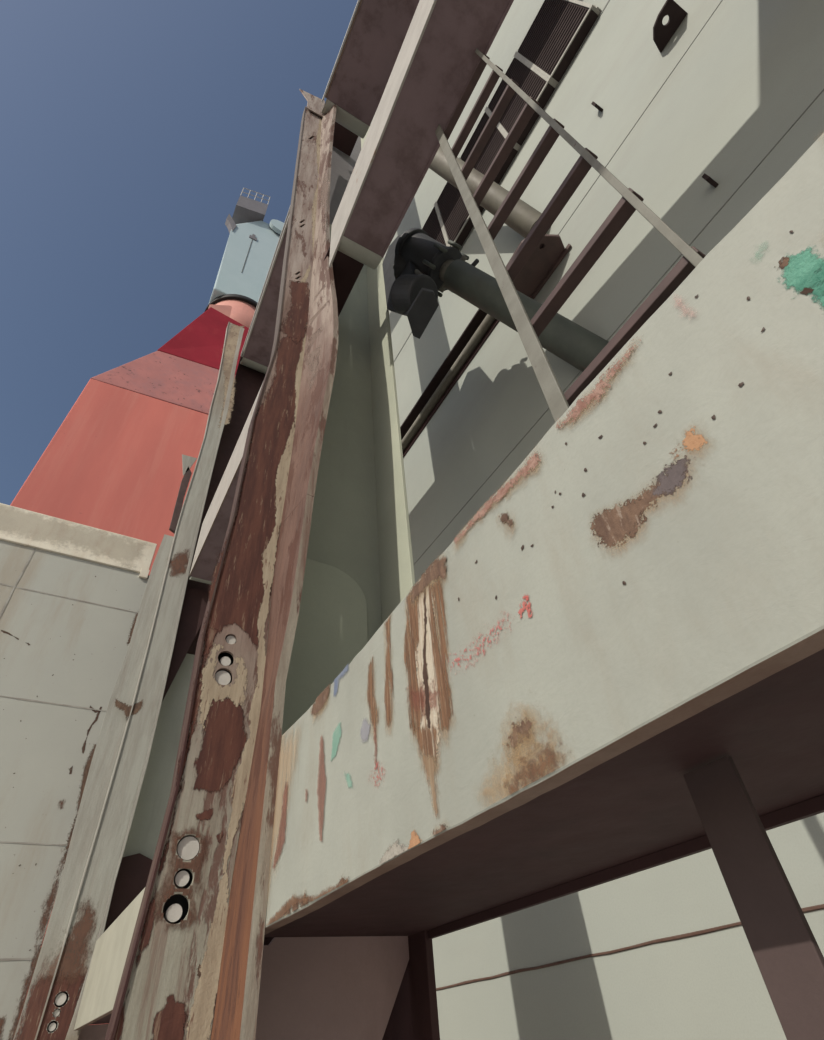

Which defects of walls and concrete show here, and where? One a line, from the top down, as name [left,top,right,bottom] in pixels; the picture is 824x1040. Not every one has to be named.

rust [168,549,190,576]
rust [114,699,144,717]
rust [305,736,326,841]
rust [367,615,393,769]
rust [404,577,453,835]
rust [485,713,558,801]
rust [0,744,96,1040]